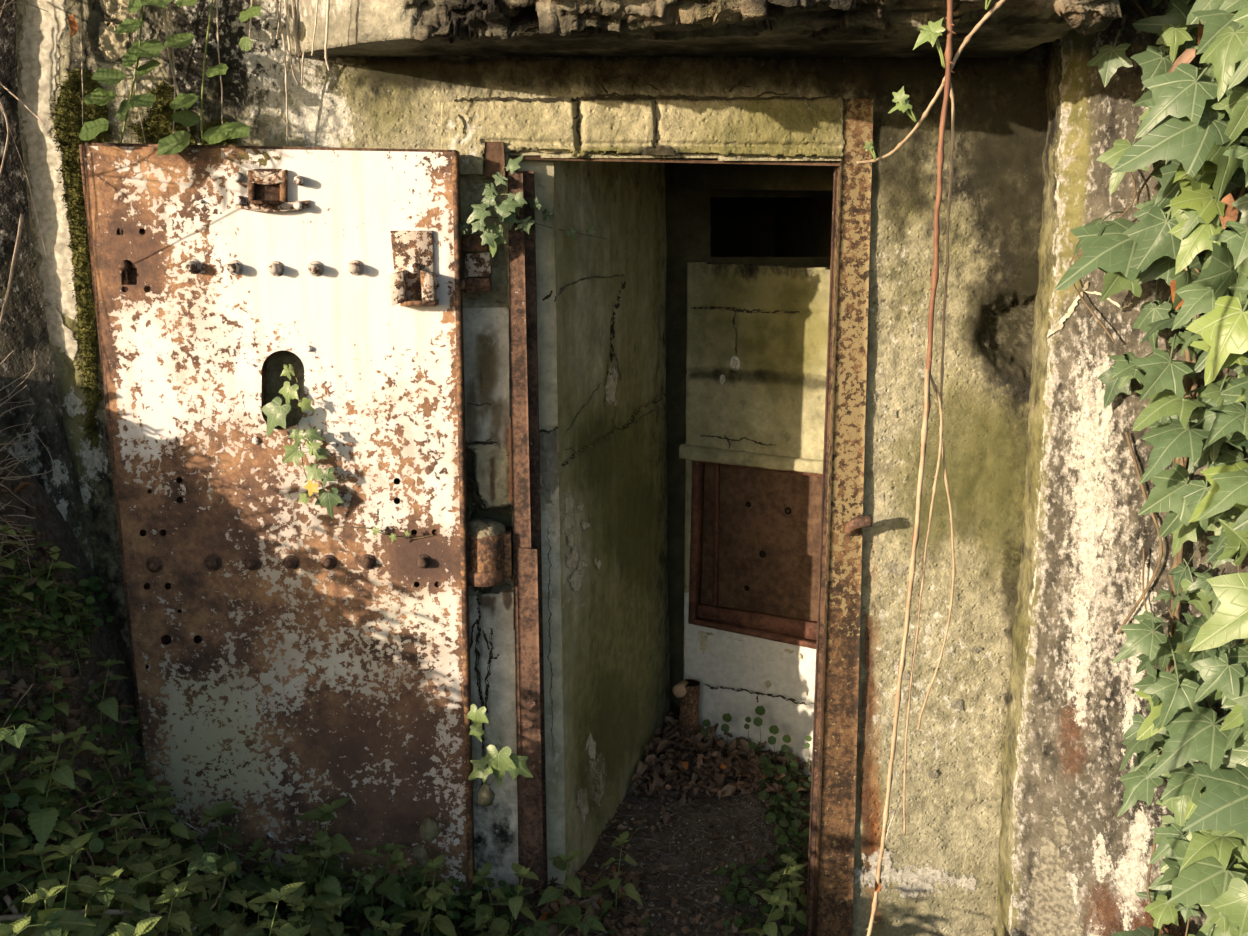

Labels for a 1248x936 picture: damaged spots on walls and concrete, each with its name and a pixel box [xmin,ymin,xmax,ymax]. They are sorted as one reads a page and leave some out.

crack [454,76,838,146]
water stain [873,47,1048,361]
crack [691,306,800,354]
water stain [61,386,86,417]
crack [539,274,663,467]
water stain [51,440,108,520]
crack [700,435,776,449]
crack [470,595,500,785]
corrosion [860,616,873,868]
water stain [853,849,977,899]